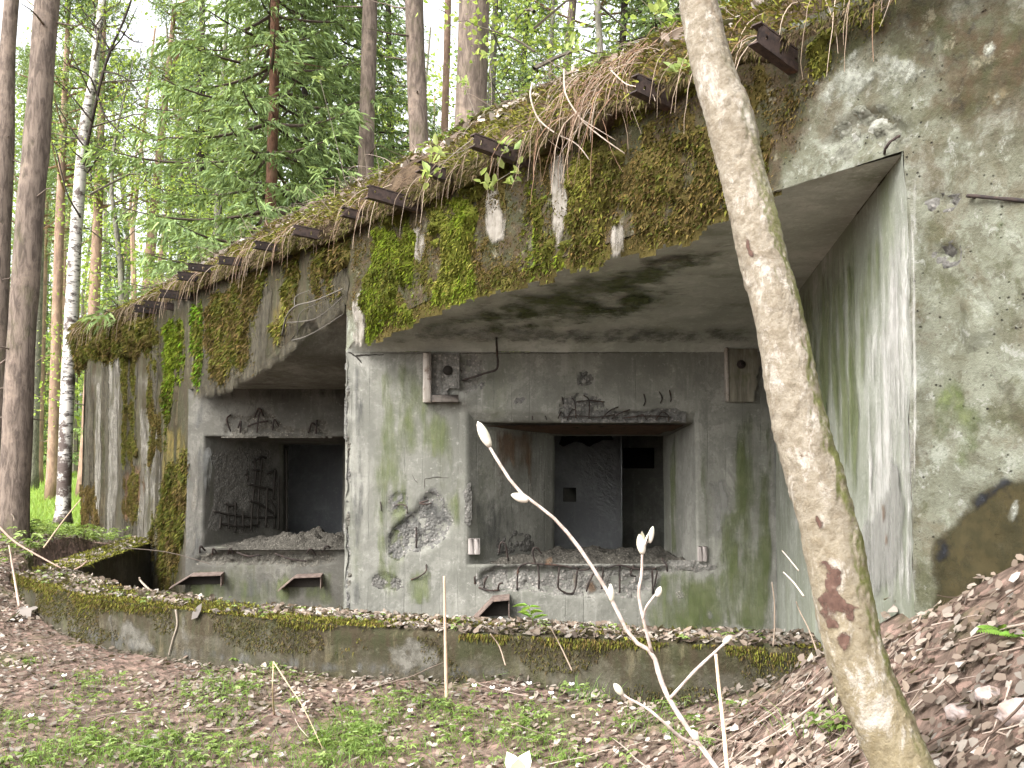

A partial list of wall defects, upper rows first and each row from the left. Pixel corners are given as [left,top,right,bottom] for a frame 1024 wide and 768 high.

spalling [532,371,672,421]
leakage [862,256,916,592]
spalling [207,447,288,535]
spalling [371,483,472,592]
spalling [495,530,717,595]
leakage [932,479,1024,609]